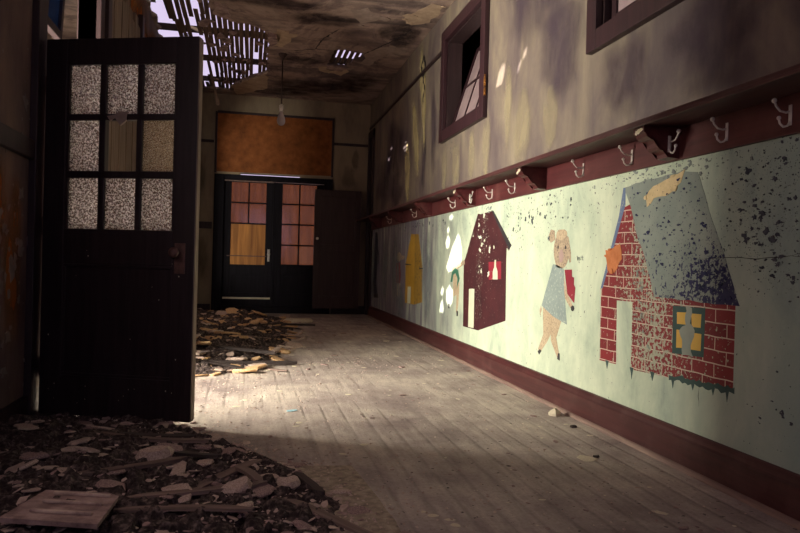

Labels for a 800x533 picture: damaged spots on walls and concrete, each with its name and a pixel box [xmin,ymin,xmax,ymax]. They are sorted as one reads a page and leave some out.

peeling [604,137,800,361]